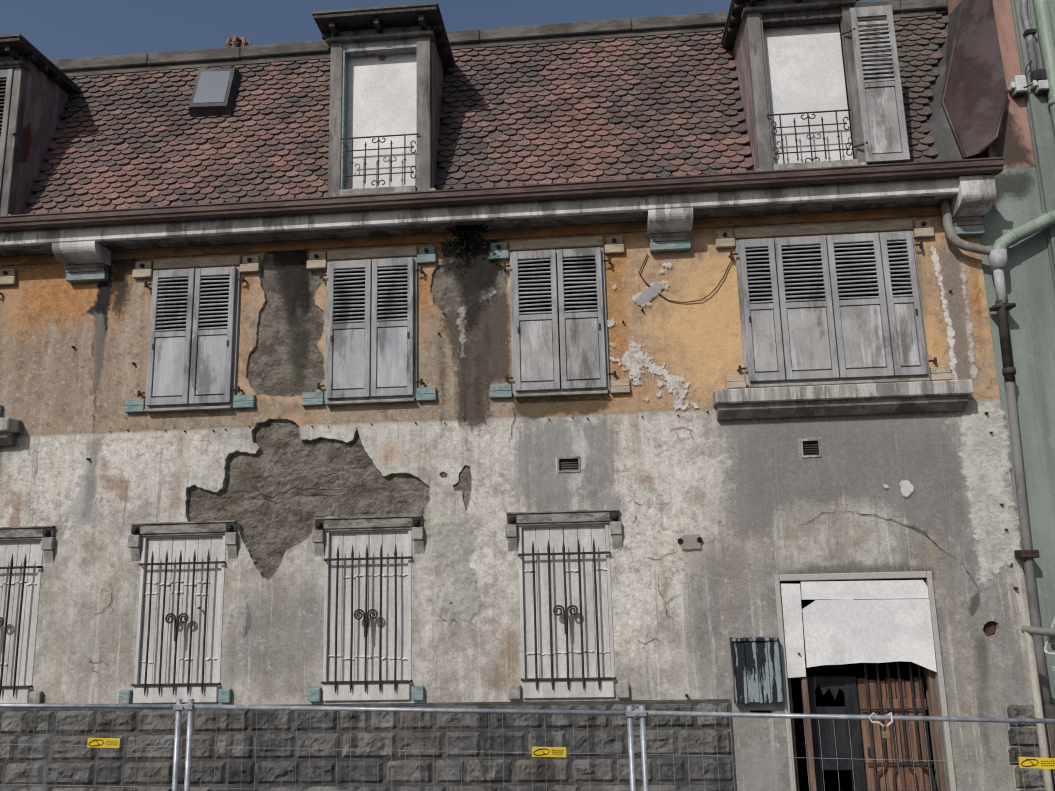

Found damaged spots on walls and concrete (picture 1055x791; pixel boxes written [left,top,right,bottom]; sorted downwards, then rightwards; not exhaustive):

damp [87,259,139,386]
spalling [245,250,325,397]
damp [441,239,511,429]
peeling [632,262,672,307]
damp [931,246,978,380]
peeling [608,340,702,413]
spalling [185,418,430,581]
spalling [439,465,472,510]
peeling [883,480,914,497]
crack [801,511,978,589]
spalling [983,621,1000,638]